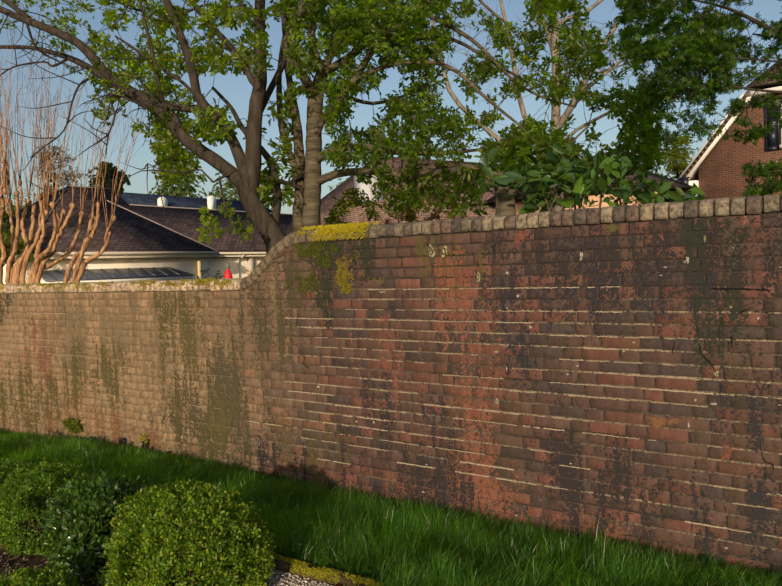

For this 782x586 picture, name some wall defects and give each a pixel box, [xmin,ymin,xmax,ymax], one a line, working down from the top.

water stain [0,213,782,573]